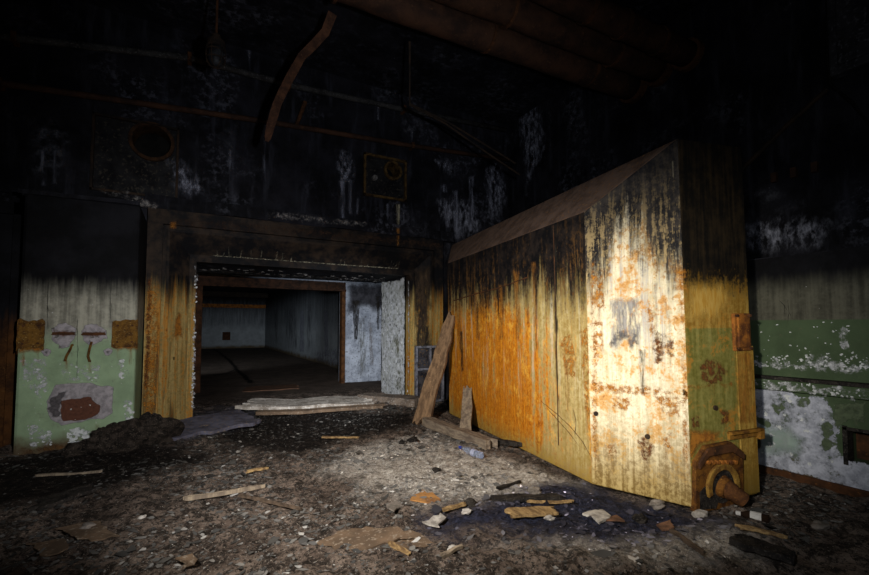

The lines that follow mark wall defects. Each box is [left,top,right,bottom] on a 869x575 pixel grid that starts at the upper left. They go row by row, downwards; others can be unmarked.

leakage [444,177,477,237]
leakage [751,224,815,248]
spalling [20,323,114,446]
leakage [353,297,380,371]
rust [561,263,752,458]
peeling [754,322,869,373]
peeling [755,380,869,491]